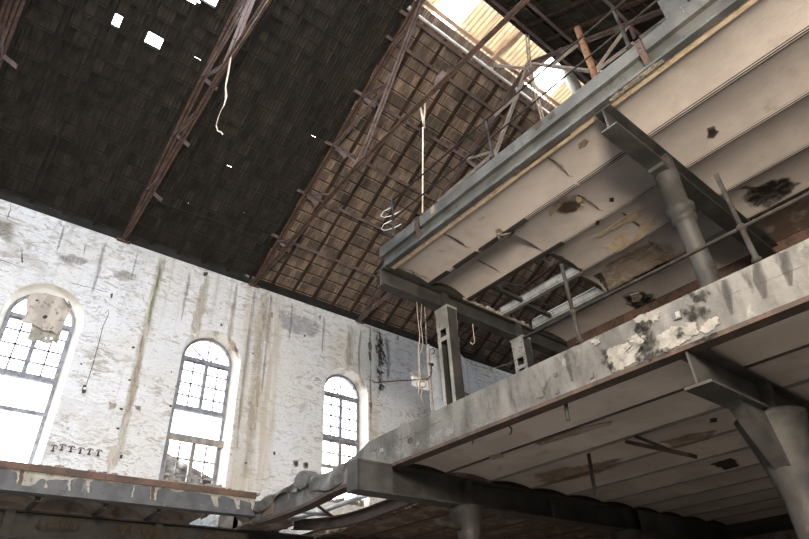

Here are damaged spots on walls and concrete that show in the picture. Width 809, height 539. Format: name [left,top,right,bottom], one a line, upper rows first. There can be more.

leakage [549,195,584,215]
spalling [591,290,720,372]
leakage [362,332,399,413]
peeling [32,460,347,525]